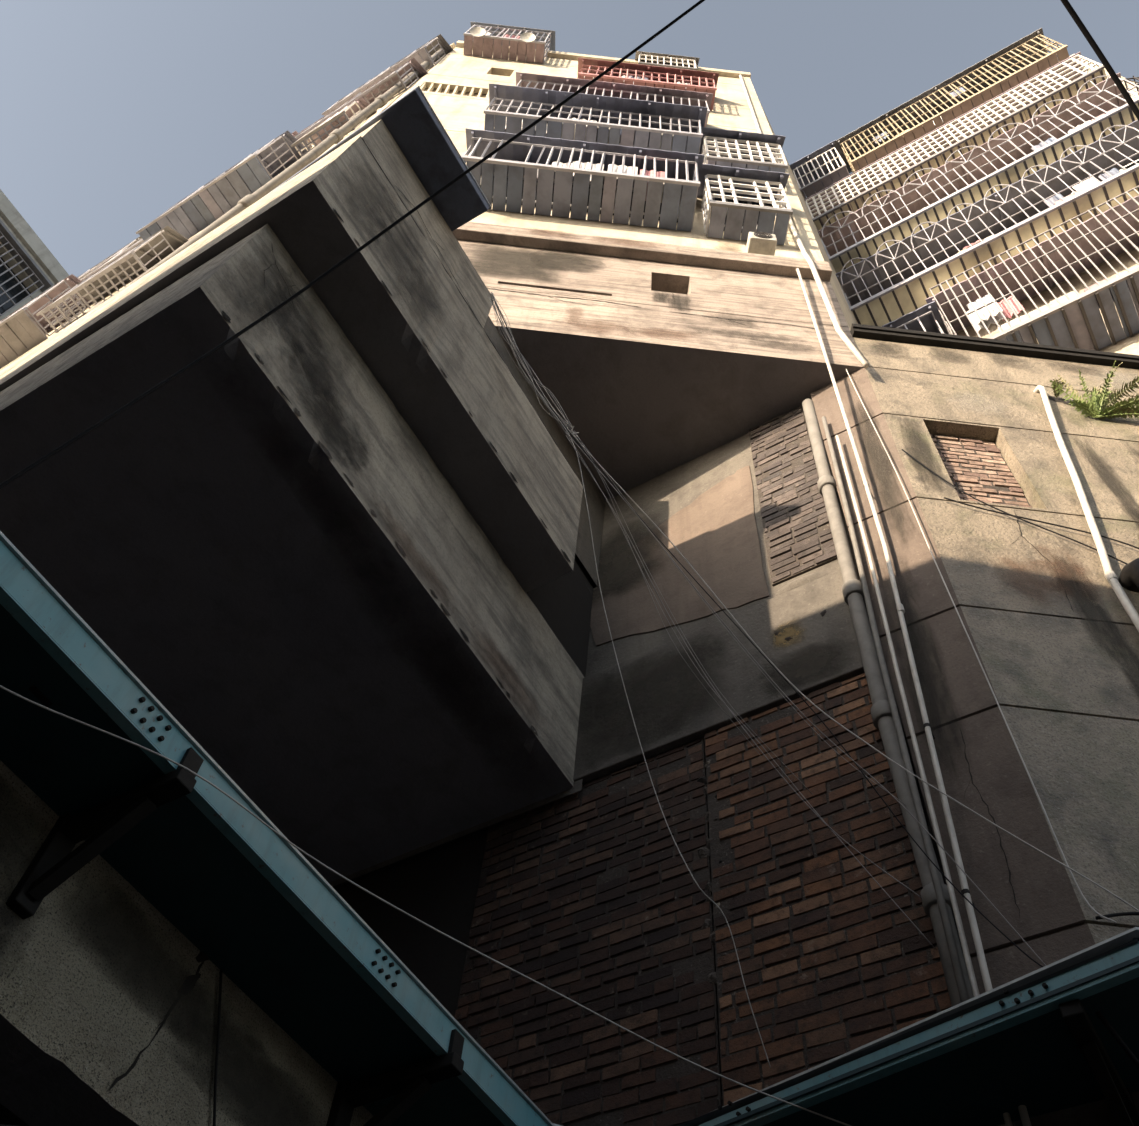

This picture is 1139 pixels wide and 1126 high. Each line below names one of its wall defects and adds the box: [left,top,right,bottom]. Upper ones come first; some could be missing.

crack [960,729,1020,916]